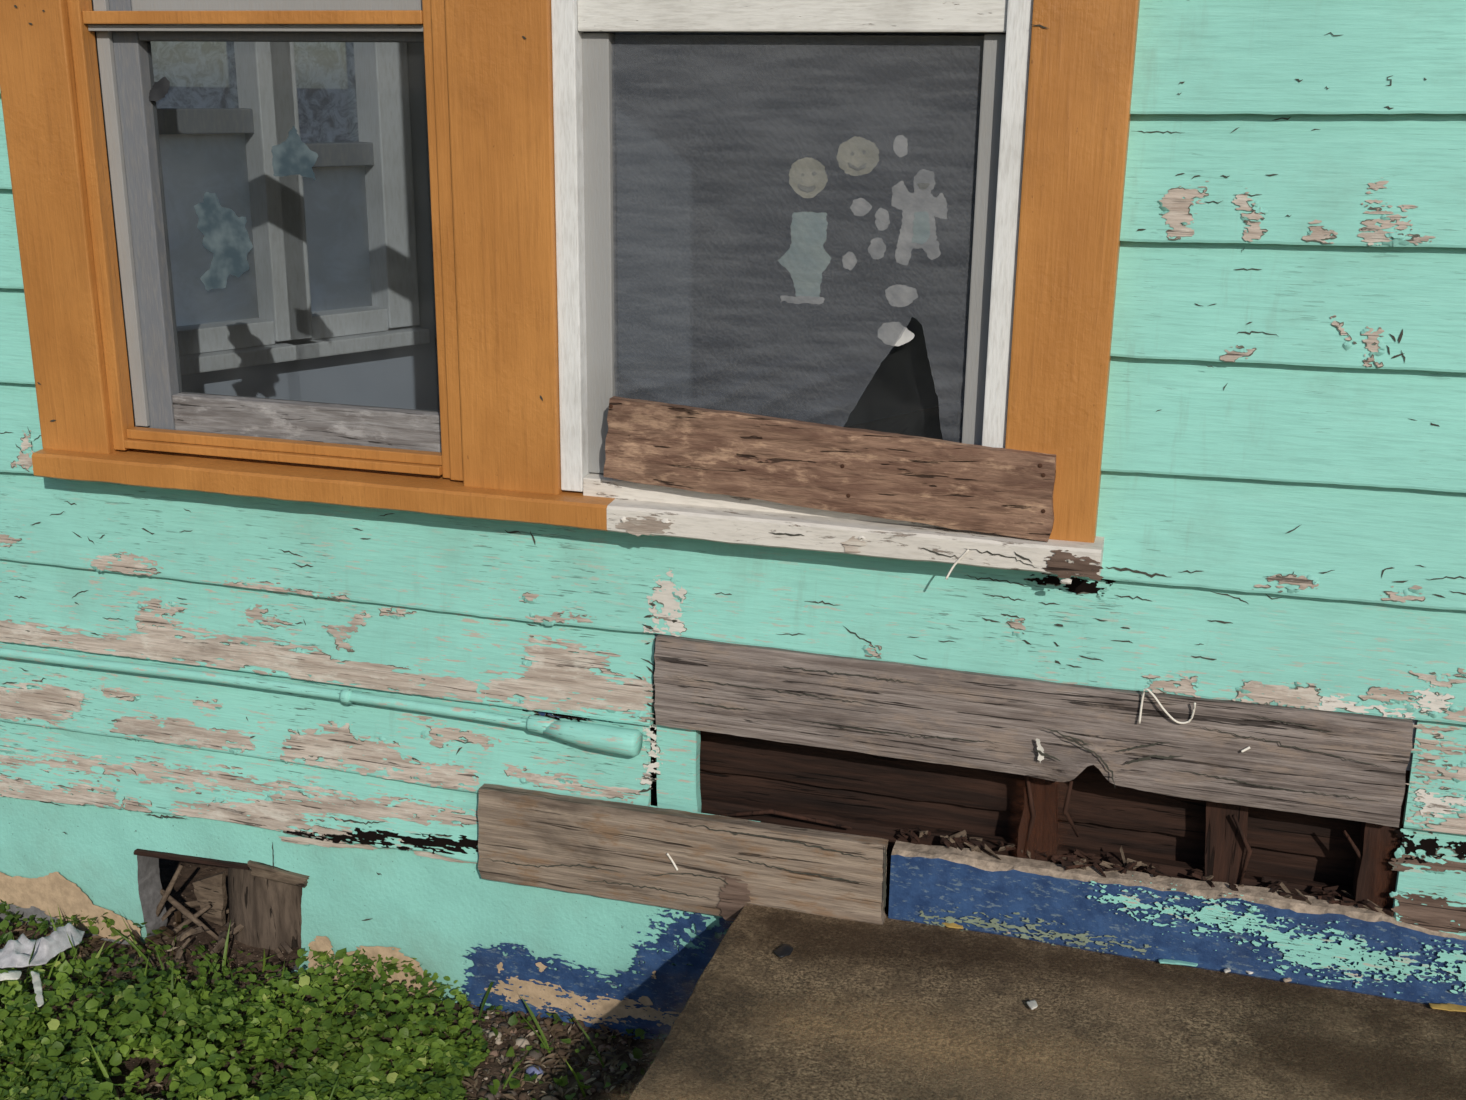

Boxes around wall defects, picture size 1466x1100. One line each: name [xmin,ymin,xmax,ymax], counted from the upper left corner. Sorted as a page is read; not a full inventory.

peeling [1157,181,1209,240]
peeling [1232,192,1268,242]
peeling [1357,181,1436,247]
peeling [1330,315,1387,368]
peeling [615,516,675,536]
peeling [643,568,687,637]
peeling [1043,550,1110,600]
peeling [0,577,663,850]
peeling [1142,673,1201,698]
peeling [1232,665,1466,874]
peeling [1083,875,1466,999]
peeling [461,909,735,1043]